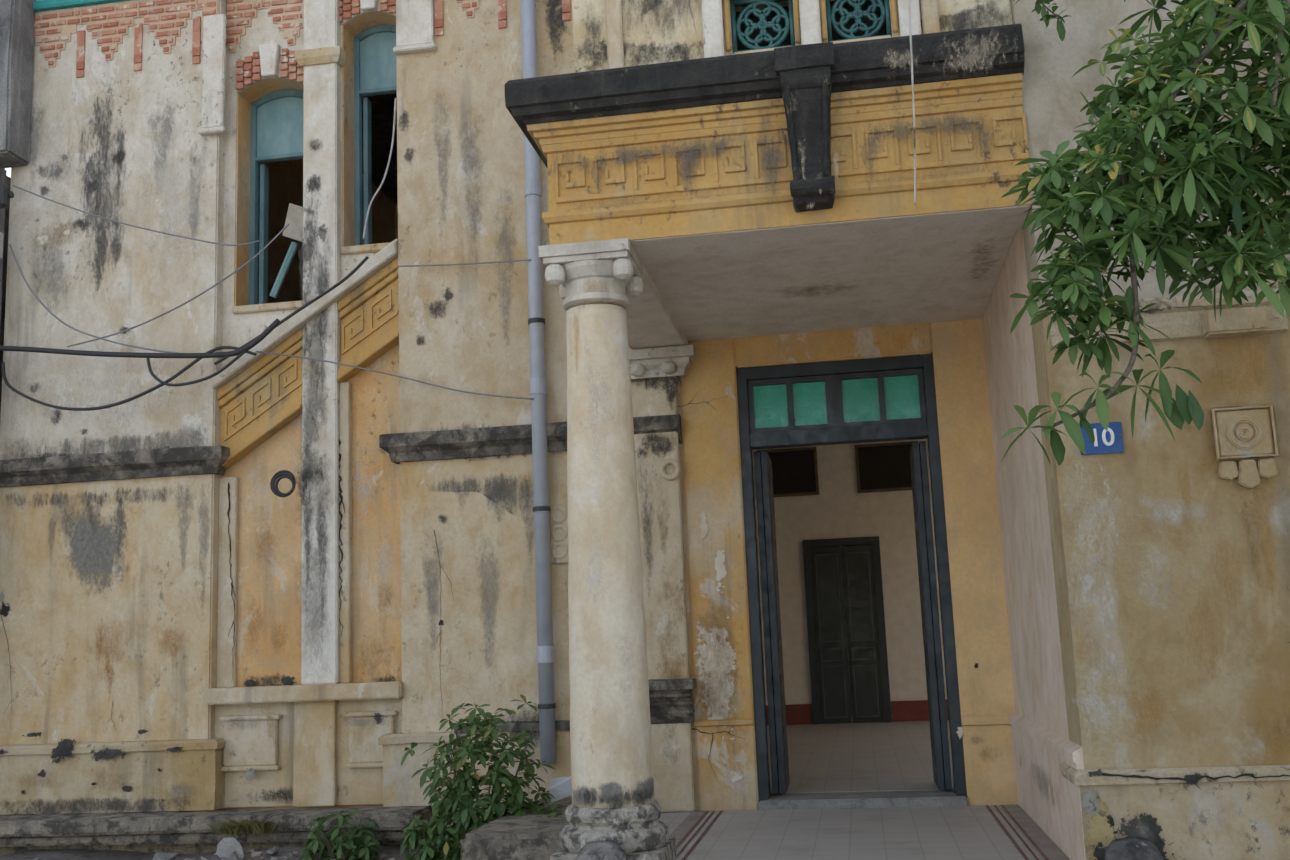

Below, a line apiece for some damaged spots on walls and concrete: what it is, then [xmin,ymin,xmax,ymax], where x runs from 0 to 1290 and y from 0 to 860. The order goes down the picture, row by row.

leakage [37,101,125,281]
leakage [430,289,452,317]
leakage [7,488,165,529]
crack [227,483,238,679]
leakage [296,448,327,624]
leakage [439,474,528,513]
peeling [699,505,728,593]
peeling [693,615,737,742]
spalling [1081,769,1115,860]
spalling [1184,773,1203,785]